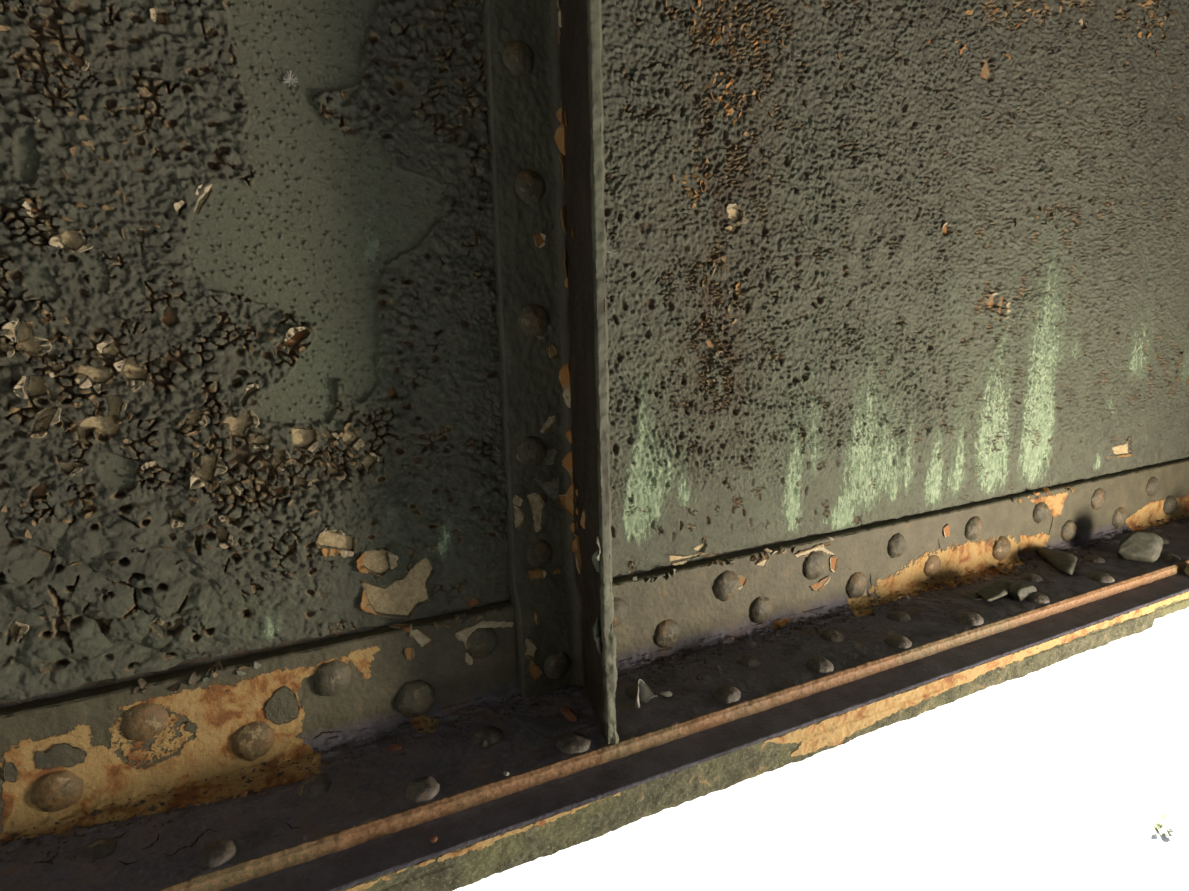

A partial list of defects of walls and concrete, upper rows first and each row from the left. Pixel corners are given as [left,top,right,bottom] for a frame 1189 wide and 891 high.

peeling [22,195,160,253]
peeling [173,184,212,213]
peeling [0,307,148,444]
peeling [240,321,314,356]
peeling [546,345,571,408]
peeling [177,383,379,514]
peeling [513,430,601,574]
corrosion [1030,492,1068,517]
corrosion [1126,494,1189,531]
corrosion [847,532,1050,617]
corrosion [765,591,1189,757]
corrosion [0,646,381,843]